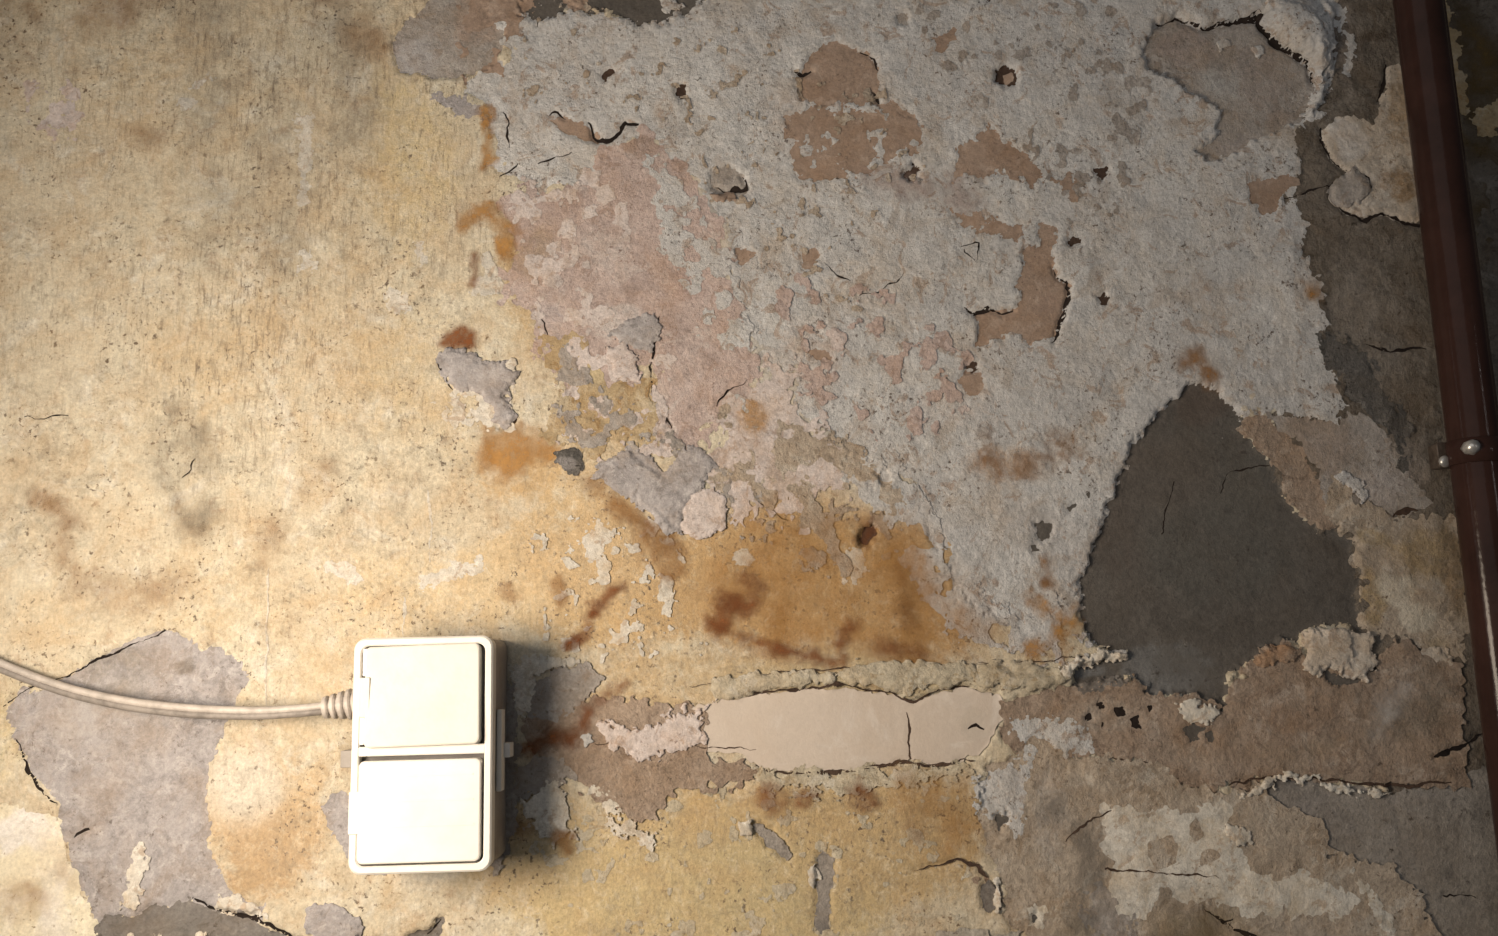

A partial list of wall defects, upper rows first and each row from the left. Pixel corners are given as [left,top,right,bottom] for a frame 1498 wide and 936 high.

crack [1155,9,1313,84]
crack [499,111,639,177]
peeling [383,286,413,315]
corrosion [485,433,557,476]
peeling [393,0,1498,936]
corrosion [589,587,620,618]
corrosion [707,594,756,633]
corrosion [564,633,585,651]
corrosion [758,624,853,665]
peeling [0,630,287,936]
peeling [320,790,349,859]
peeling [304,903,364,936]